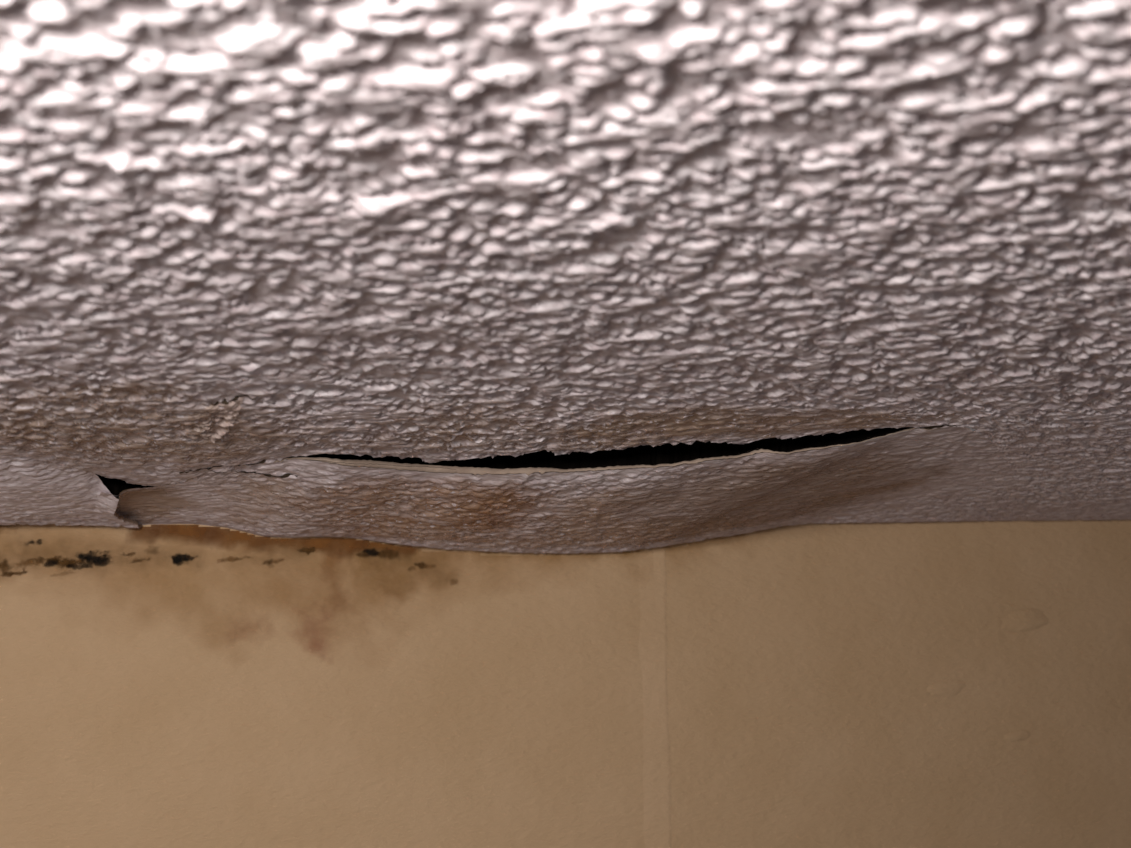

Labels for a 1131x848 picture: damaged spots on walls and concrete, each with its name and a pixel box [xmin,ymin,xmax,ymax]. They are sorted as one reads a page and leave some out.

crack [210,395,256,405]
damp [579,410,806,442]
crack [179,425,956,478]
damp [320,487,529,537]
damp [0,551,109,576]
damp [172,554,193,565]
damp [357,549,398,558]